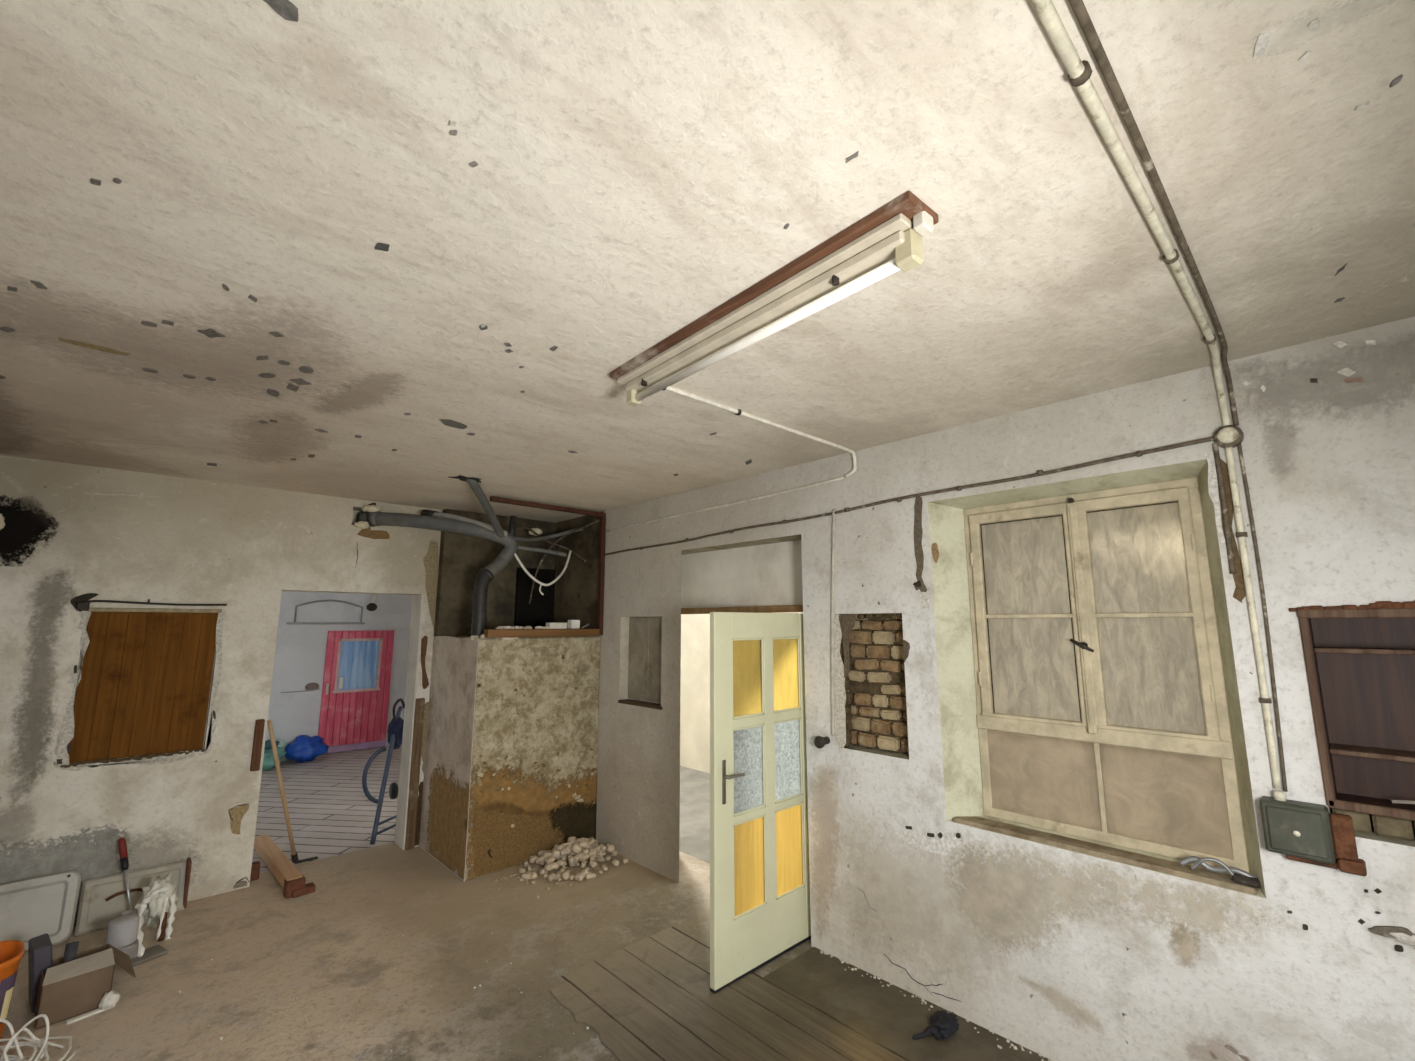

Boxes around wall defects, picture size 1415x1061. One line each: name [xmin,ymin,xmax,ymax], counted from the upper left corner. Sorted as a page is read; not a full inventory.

damp [90,178,122,186]
damp [7,280,47,292]
damp [58,338,131,355]
damp [197,329,226,338]
damp [256,355,314,397]
flaking render [913,497,940,609]
damp [20,571,73,780]
flaking render [834,613,902,751]